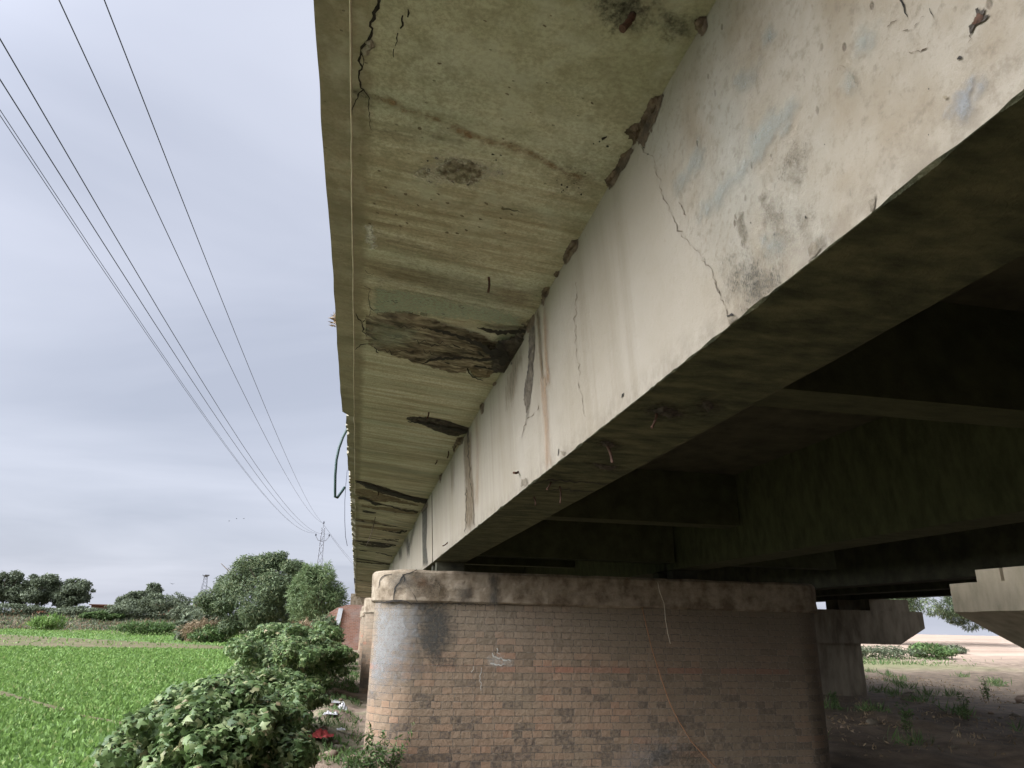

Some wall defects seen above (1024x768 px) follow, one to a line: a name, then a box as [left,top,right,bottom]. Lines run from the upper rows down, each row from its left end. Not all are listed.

crack [352,0,410,128]
spalling [968,8,988,41]
spalling [604,93,664,190]
spalling [365,239,578,415]
spalling [407,412,469,483]
spalling [355,480,428,565]